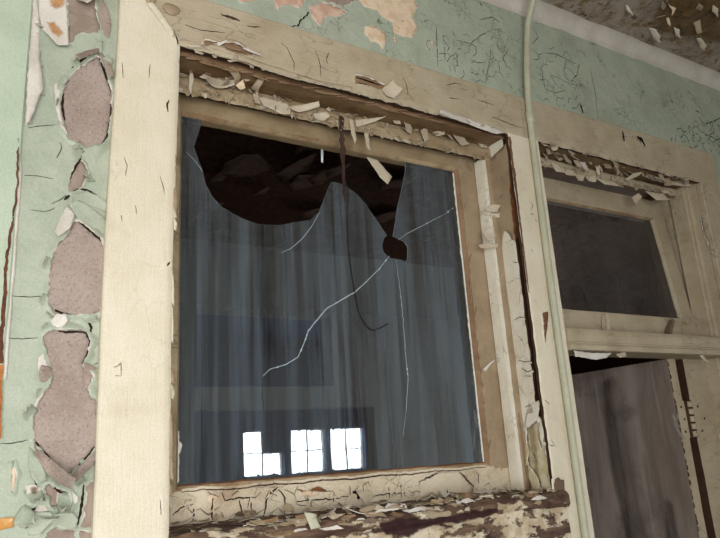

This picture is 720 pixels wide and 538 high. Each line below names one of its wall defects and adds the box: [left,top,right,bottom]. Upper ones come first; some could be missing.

peeling [273,0,419,51]
peeling [656,0,681,38]
peeling [694,20,707,51]
crack [425,15,523,128]
crack [532,28,599,120]
peeling [173,37,515,248]
peeling [541,141,695,204]
crack [671,109,720,154]
peeling [0,0,114,538]
crack [160,465,496,524]
peeling [169,401,566,538]